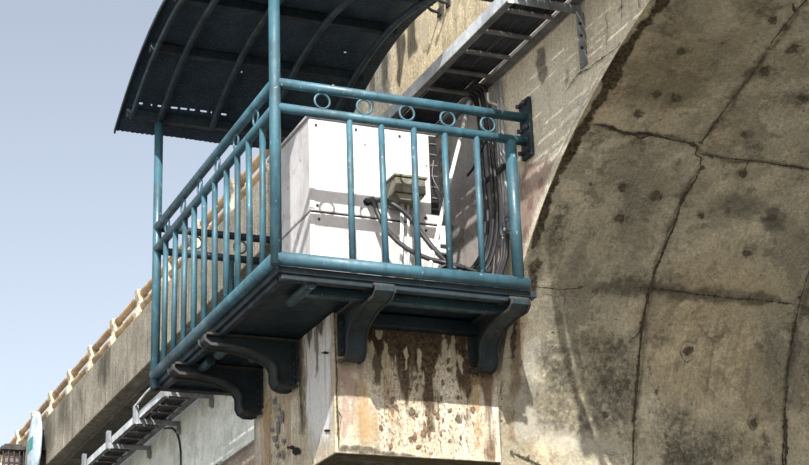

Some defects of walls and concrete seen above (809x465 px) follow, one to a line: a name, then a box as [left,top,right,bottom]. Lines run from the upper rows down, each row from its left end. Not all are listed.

crack [565,0,640,92]
damp [523,0,670,292]
crack [594,0,809,465]
crack [533,285,588,319]
corrosion [474,372,495,461]
crack [510,450,541,465]
damp [538,338,634,437]